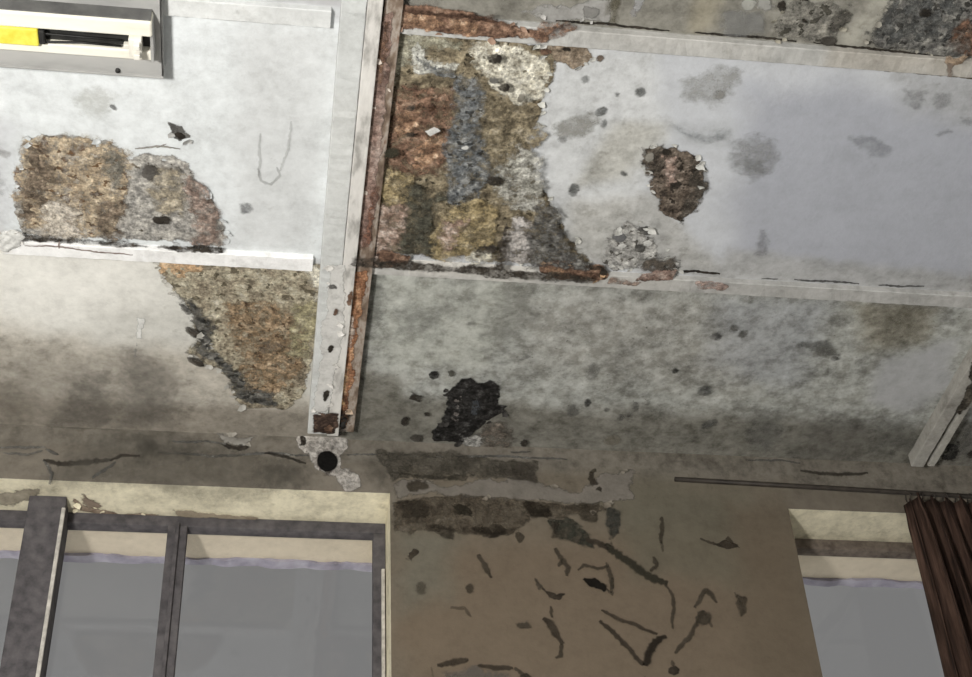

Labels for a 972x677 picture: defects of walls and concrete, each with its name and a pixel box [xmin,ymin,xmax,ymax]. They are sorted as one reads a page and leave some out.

spalling [863,0,972,59]
rust [945,55,968,77]
spalling [641,144,709,222]
spalling [0,34,684,415]
rust [313,4,577,436]
damp [798,342,839,360]
spalling [410,370,528,448]
crack [0,440,309,485]
peeling [393,468,634,505]
crack [586,517,675,629]
crack [542,606,564,659]
crack [437,658,526,677]